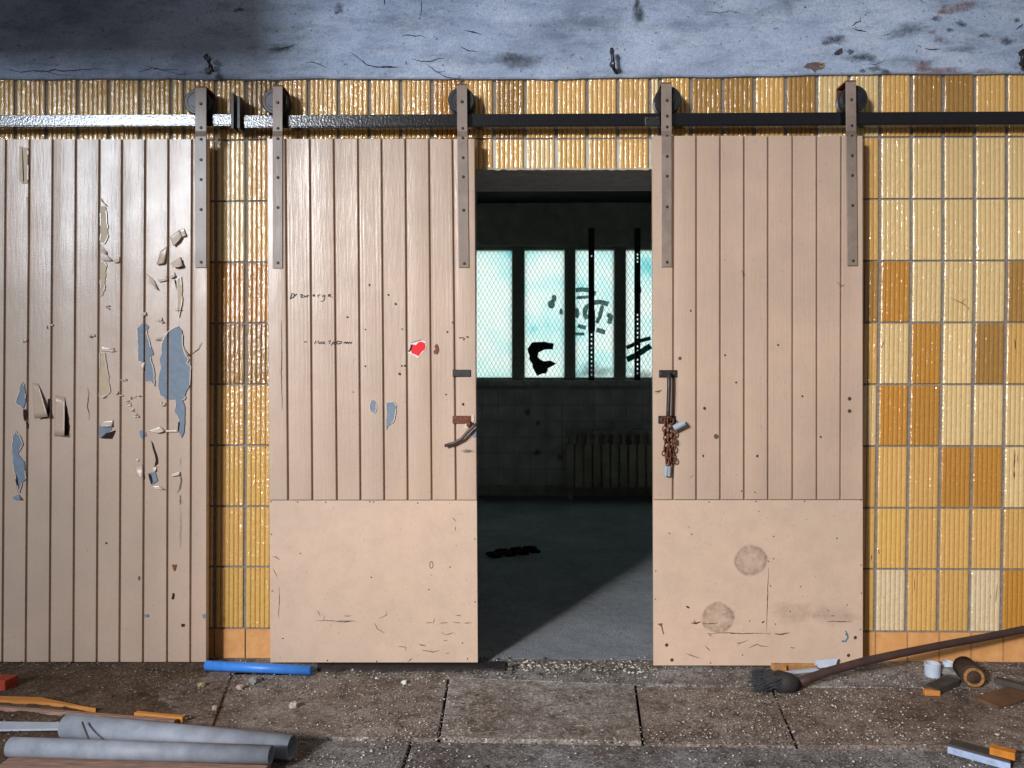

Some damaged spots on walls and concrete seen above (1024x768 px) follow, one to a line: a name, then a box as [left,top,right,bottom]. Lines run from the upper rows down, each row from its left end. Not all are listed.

crack [8,68,106,76]
crack [351,30,482,79]
peeling [100,198,108,255]
peeling [135,228,191,490]
peeling [11,381,70,500]
peeling [369,400,396,430]